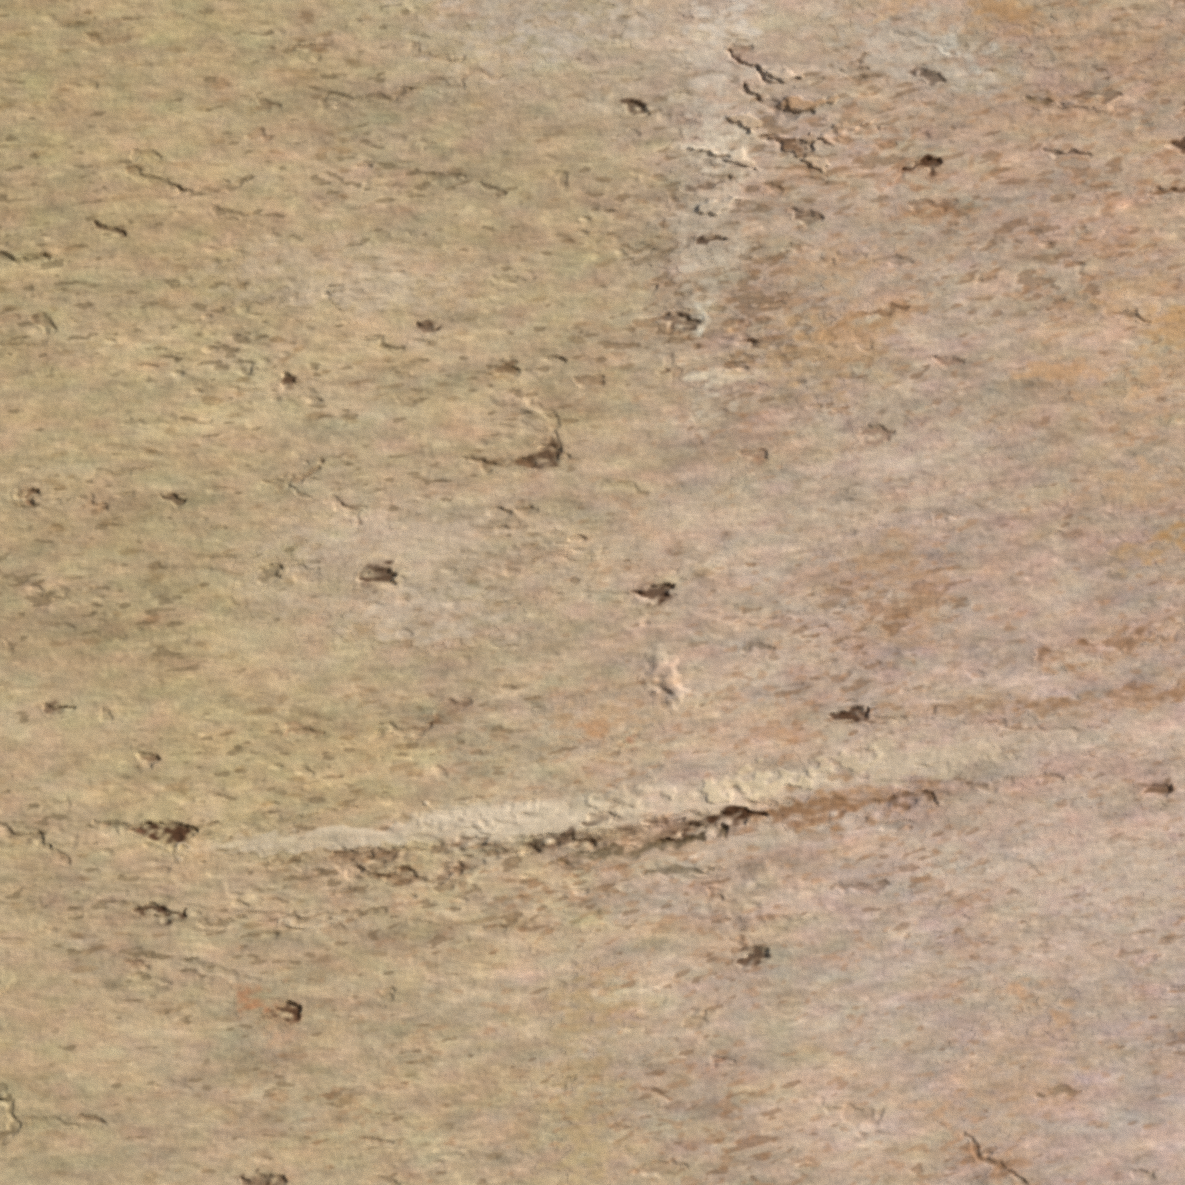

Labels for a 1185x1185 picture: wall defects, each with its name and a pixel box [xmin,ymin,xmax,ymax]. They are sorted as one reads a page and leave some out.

crack [865,597,1185,737]
crack [378,694,473,740]
crack [0,818,72,868]
crack [90,803,360,850]
crack [239,771,1068,927]